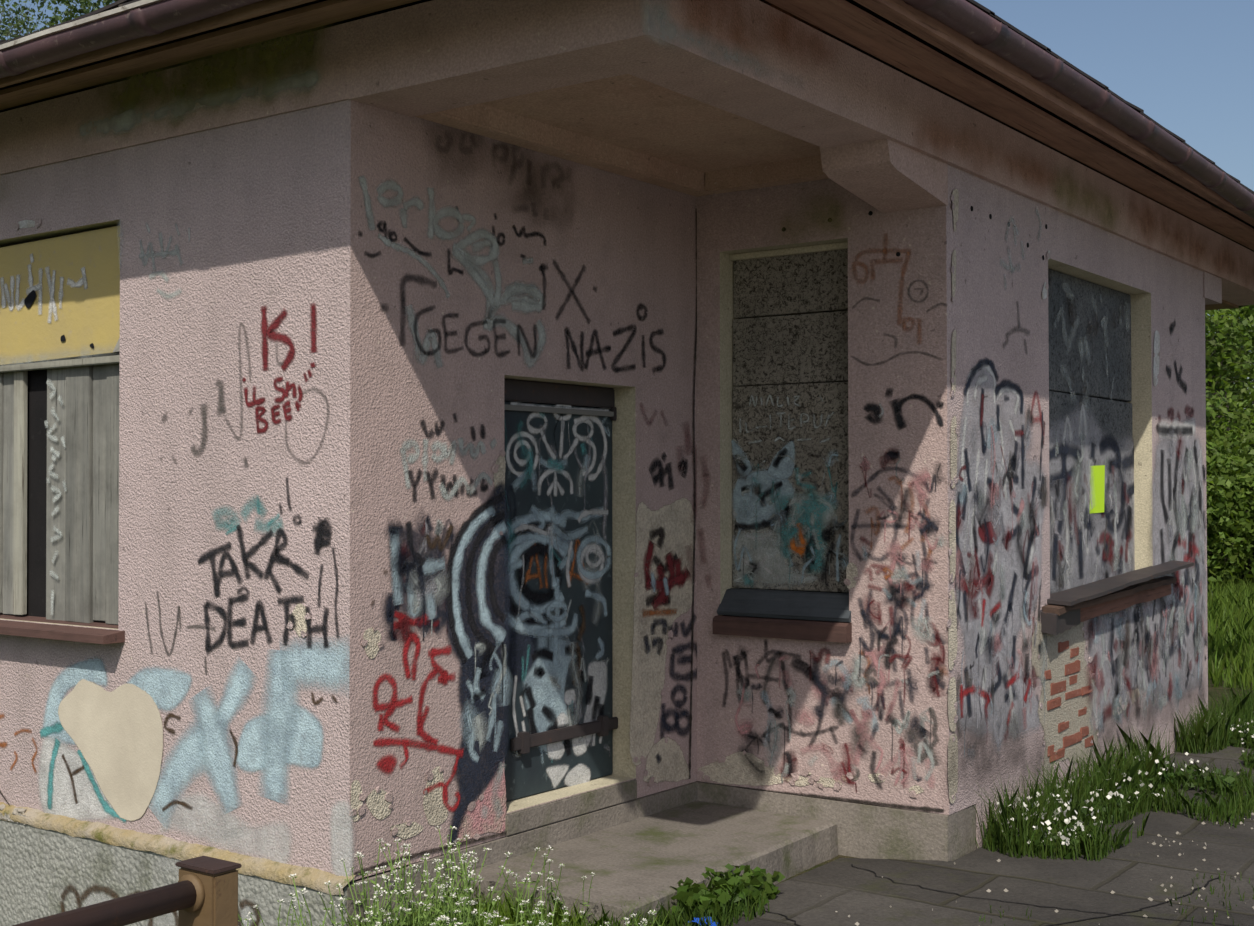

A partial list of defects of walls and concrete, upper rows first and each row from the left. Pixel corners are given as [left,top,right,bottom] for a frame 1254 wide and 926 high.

leakage [80,28,317,135]
flaking render [1031,620,1099,781]